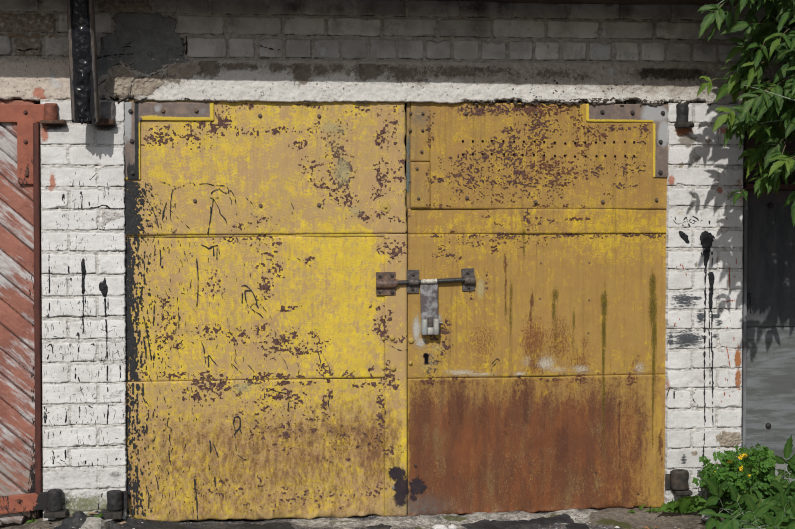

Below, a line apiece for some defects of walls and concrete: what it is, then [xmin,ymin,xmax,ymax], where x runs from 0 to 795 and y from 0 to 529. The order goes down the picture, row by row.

spalling [103,61,202,99]
damp [129,70,181,93]
damp [196,58,258,79]
damp [270,43,592,87]
peeling [140,99,411,223]
spalling [426,80,711,261]
peeling [212,217,289,300]
peeling [147,295,331,360]
peeling [366,304,408,343]
rust [519,316,593,427]
peeling [158,360,404,467]
peeling [180,475,390,512]